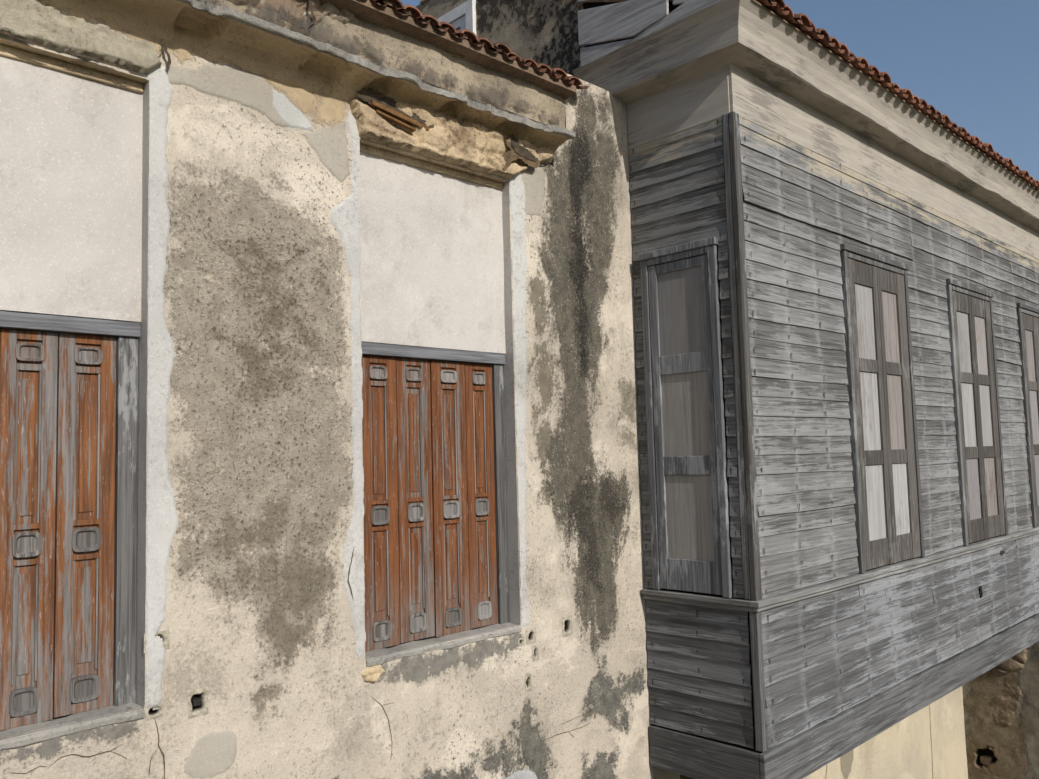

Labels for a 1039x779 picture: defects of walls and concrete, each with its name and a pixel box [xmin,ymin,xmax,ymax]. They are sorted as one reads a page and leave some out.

flaking render [163,160,354,674]
leakage [528,82,646,779]
crack [9,717,165,779]
leakage [411,699,553,779]
flaking render [963,646,1032,779]